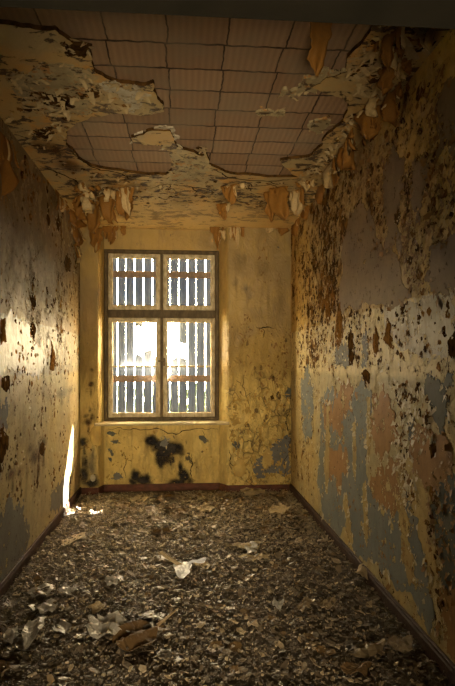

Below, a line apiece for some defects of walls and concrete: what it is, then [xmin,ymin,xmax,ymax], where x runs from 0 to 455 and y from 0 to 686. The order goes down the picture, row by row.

peeling [55,168,181,274]
peeling [210,227,244,250]
peeling [202,181,261,220]
peeling [11,317,68,437]
peeling [43,279,77,379]
peeling [229,329,291,503]